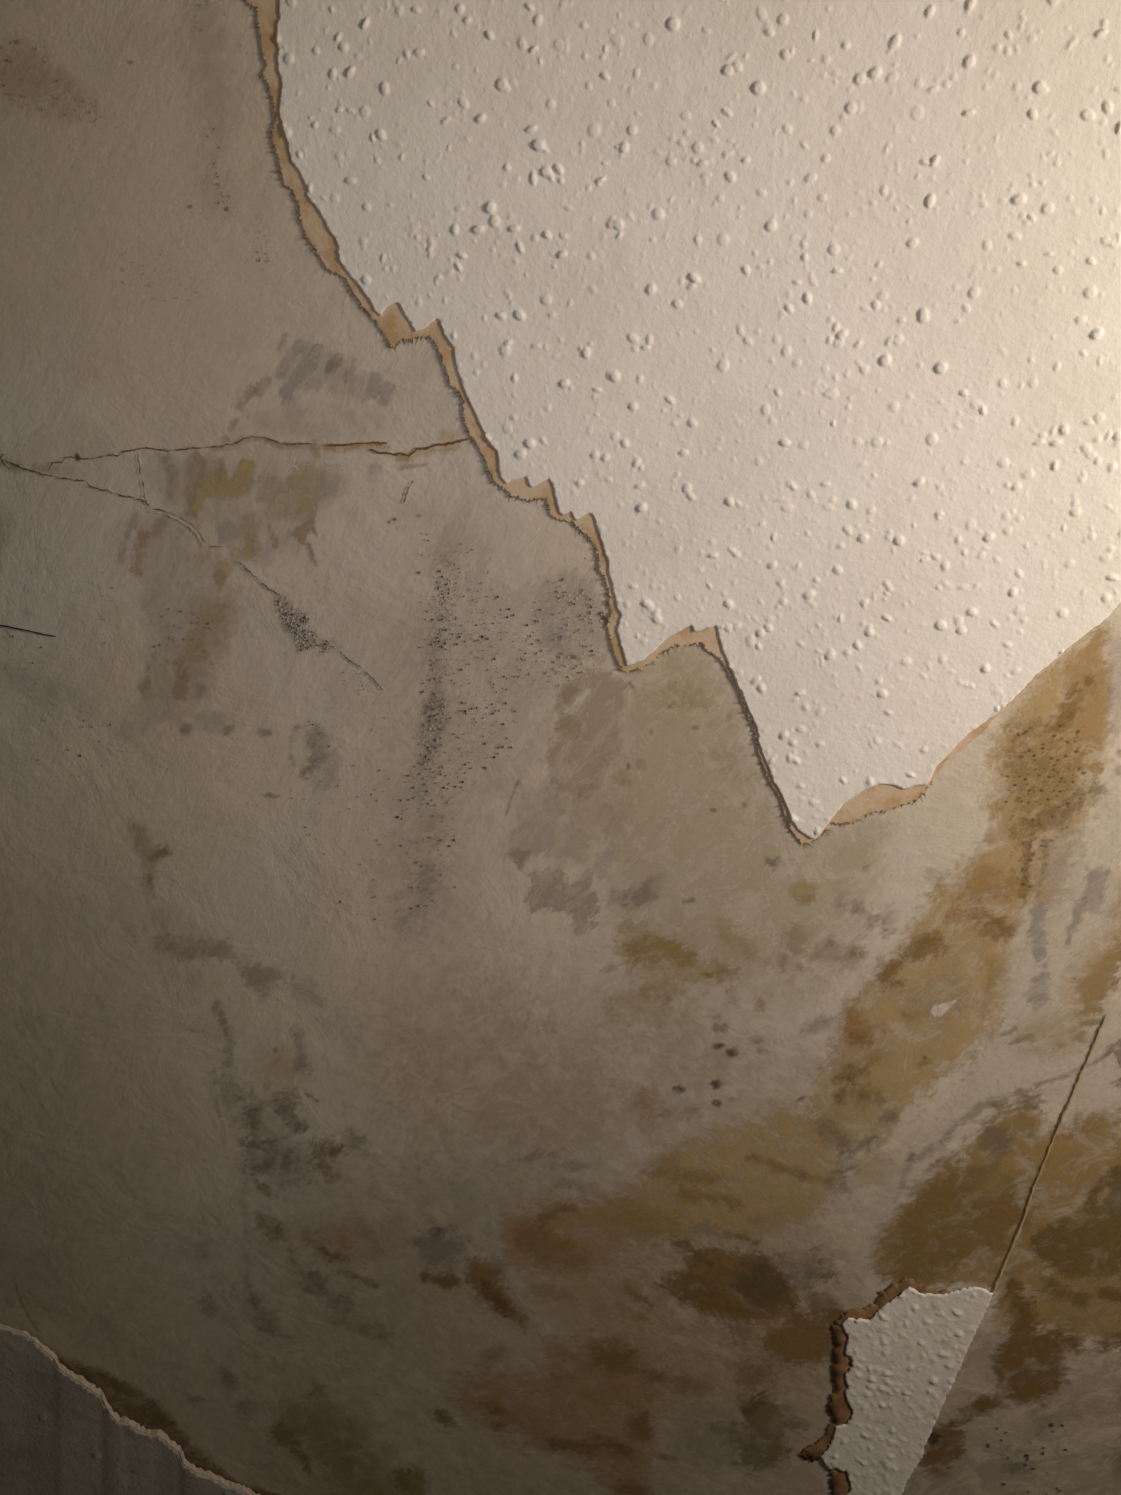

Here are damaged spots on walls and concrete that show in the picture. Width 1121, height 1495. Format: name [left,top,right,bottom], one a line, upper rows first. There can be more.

crack [0,435,470,595]
flaking render [276,593,337,653]
crack [337,649,382,690]
leakage [415,629,1121,1495]